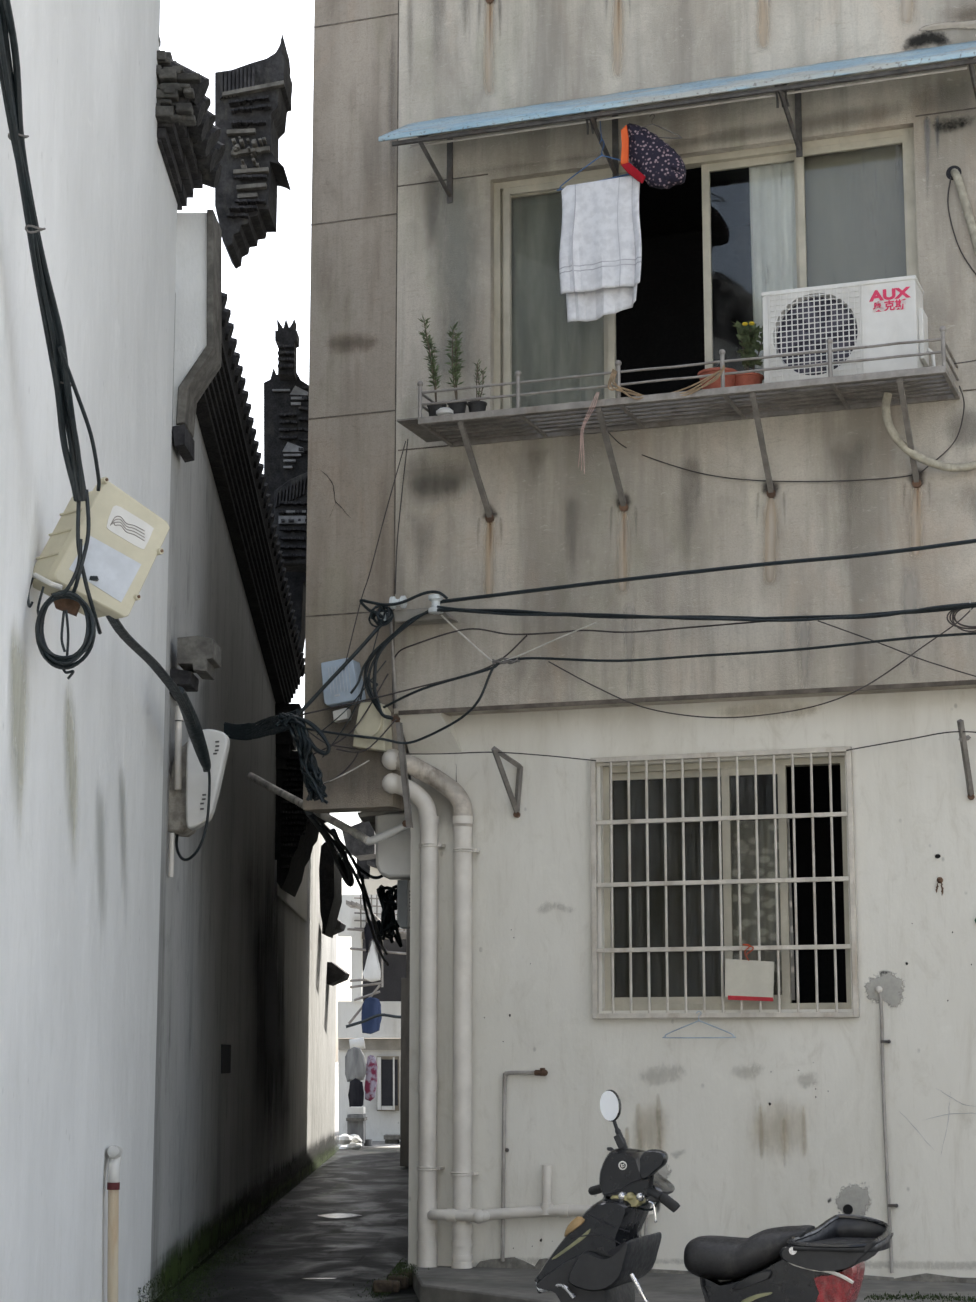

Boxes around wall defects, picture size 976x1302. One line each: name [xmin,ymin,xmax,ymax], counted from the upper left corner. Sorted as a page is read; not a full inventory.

rust [614,0,622,75]